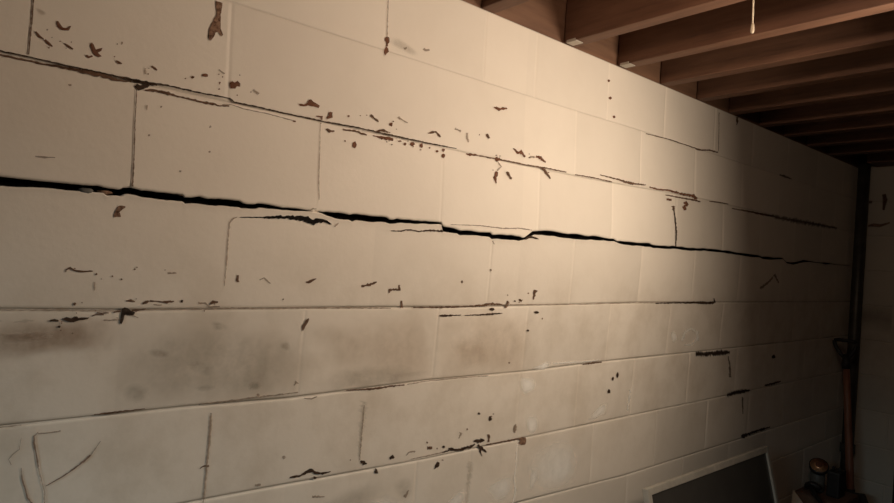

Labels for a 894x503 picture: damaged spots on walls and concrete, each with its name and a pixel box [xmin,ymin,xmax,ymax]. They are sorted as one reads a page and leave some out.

crack [0,0,837,285]
crack [0,306,122,314]
crack [145,304,391,312]
crack [413,298,716,317]
crack [346,375,486,391]
crack [199,392,316,405]
crack [94,407,145,415]
crack [413,438,519,459]
crack [0,425,101,503]